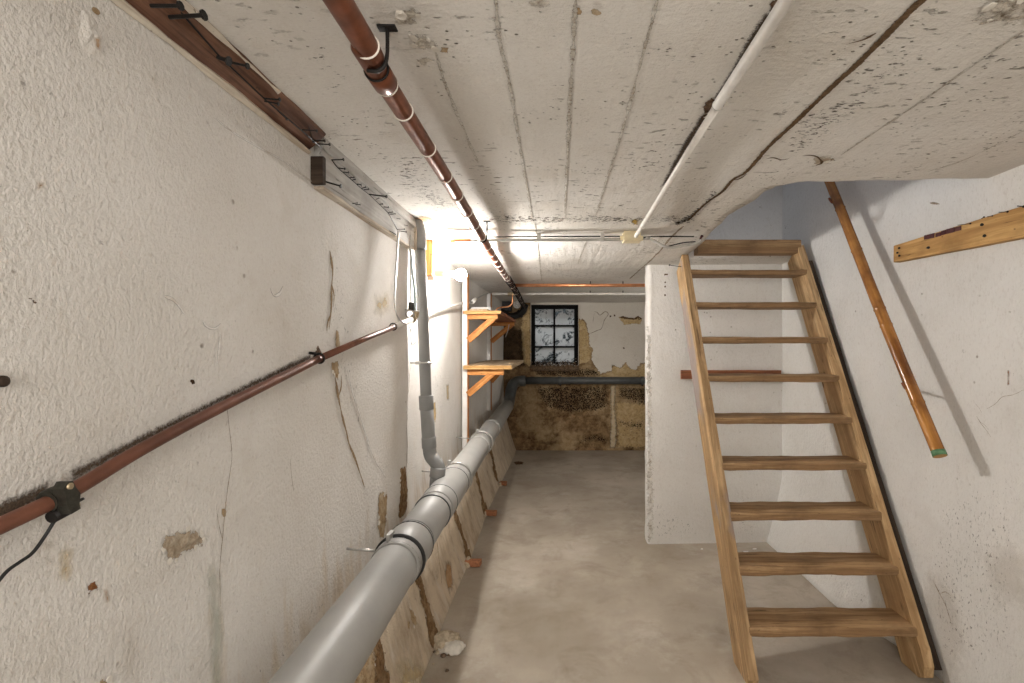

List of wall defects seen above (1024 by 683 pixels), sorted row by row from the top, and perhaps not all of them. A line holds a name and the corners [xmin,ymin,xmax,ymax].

crack [630,0,1024,279]
crack [327,252,335,328]
crack [335,377,365,488]
peeling [503,303,655,542]
water stain [534,367,645,447]
spalling [161,525,206,565]
crack [217,410,232,604]
spalling [377,491,388,541]
spalling [354,639,384,683]